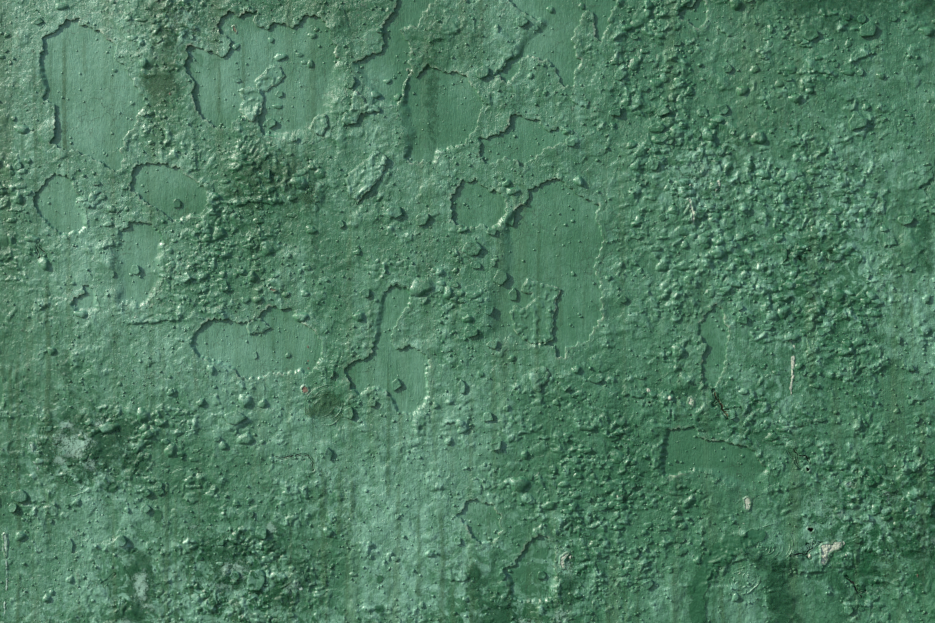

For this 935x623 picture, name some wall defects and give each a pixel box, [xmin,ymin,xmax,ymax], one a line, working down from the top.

peeling [31,13,212,320]
peeling [340,282,435,419]
peeling [179,0,621,395]
peeling [454,494,507,549]